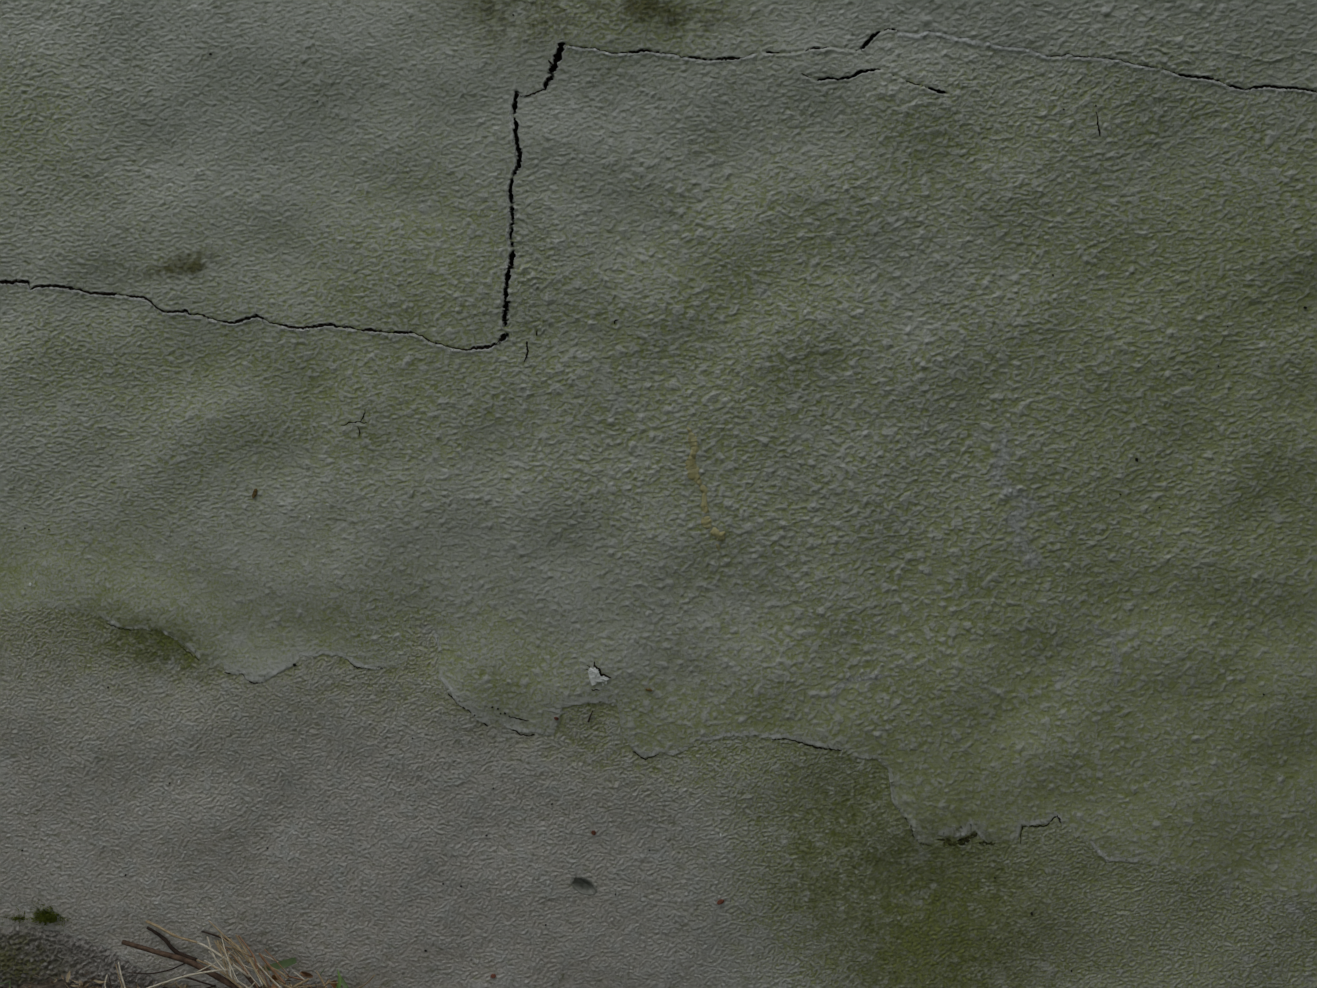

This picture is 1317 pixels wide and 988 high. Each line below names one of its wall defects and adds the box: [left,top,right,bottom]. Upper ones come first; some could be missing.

crack [0,27,1317,362]
flaking render [545,661,618,715]